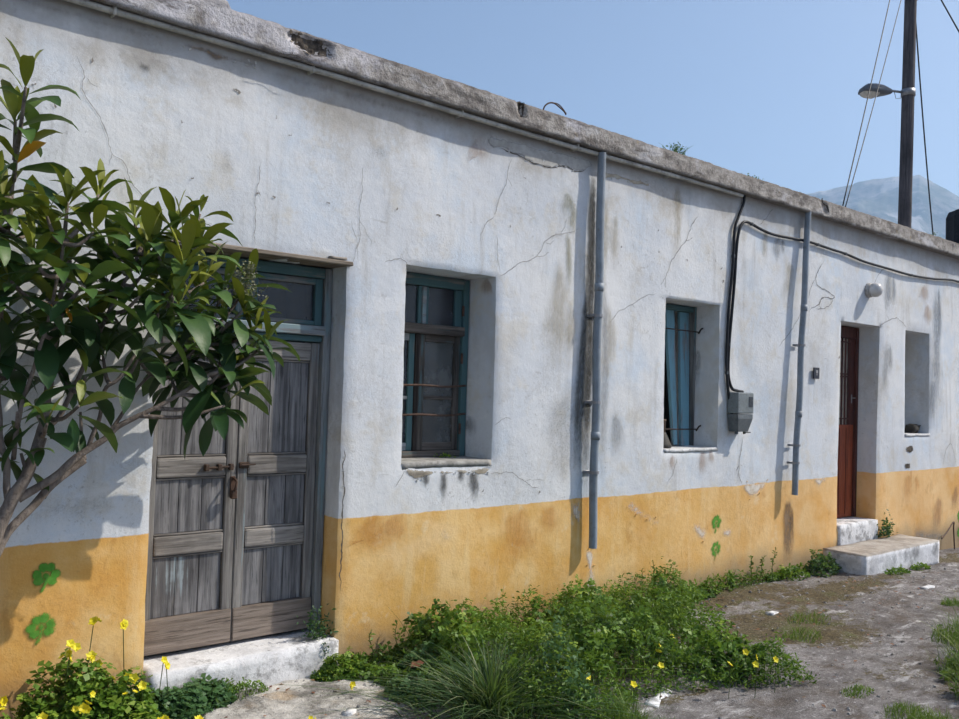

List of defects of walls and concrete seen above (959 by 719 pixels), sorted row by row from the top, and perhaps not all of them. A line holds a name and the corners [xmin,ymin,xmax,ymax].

spalling [290,30,332,57]
crack [77,57,148,203]
crack [351,169,372,261]
crack [480,159,576,276]
water stain [575,189,595,439]
crack [610,220,695,322]
crack [784,266,835,340]
crack [338,451,346,586]